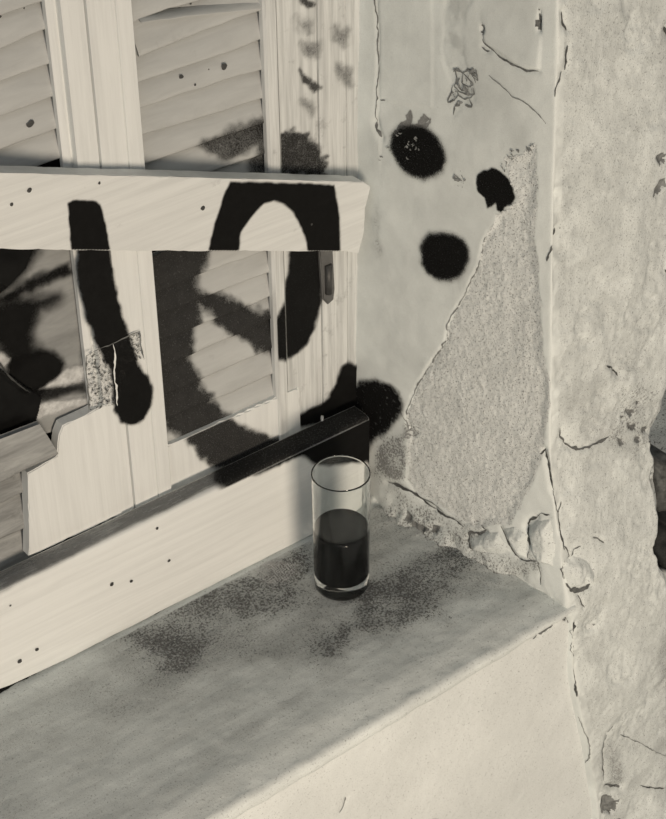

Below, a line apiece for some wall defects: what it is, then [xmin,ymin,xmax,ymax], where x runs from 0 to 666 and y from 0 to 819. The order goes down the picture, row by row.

crack [482,39,539,72]
crack [490,76,546,124]
spalling [406,143,551,530]
crack [389,237,608,697]
spalling [404,510,440,533]
water stain [109,424,540,722]
crack [578,717,666,788]